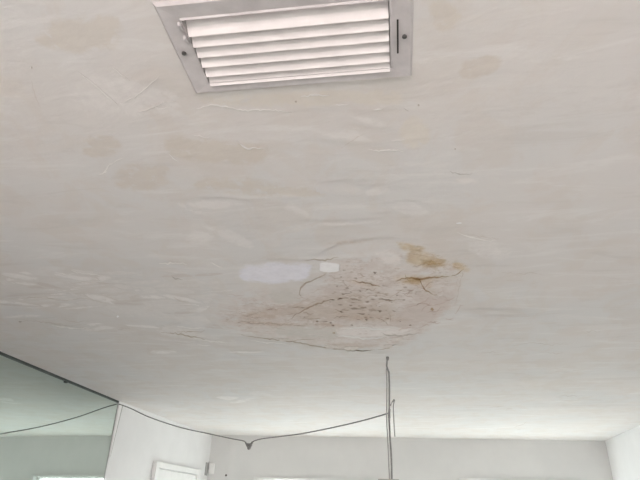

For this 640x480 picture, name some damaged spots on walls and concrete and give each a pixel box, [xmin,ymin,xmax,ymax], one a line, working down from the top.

peeling [203,237,474,354]